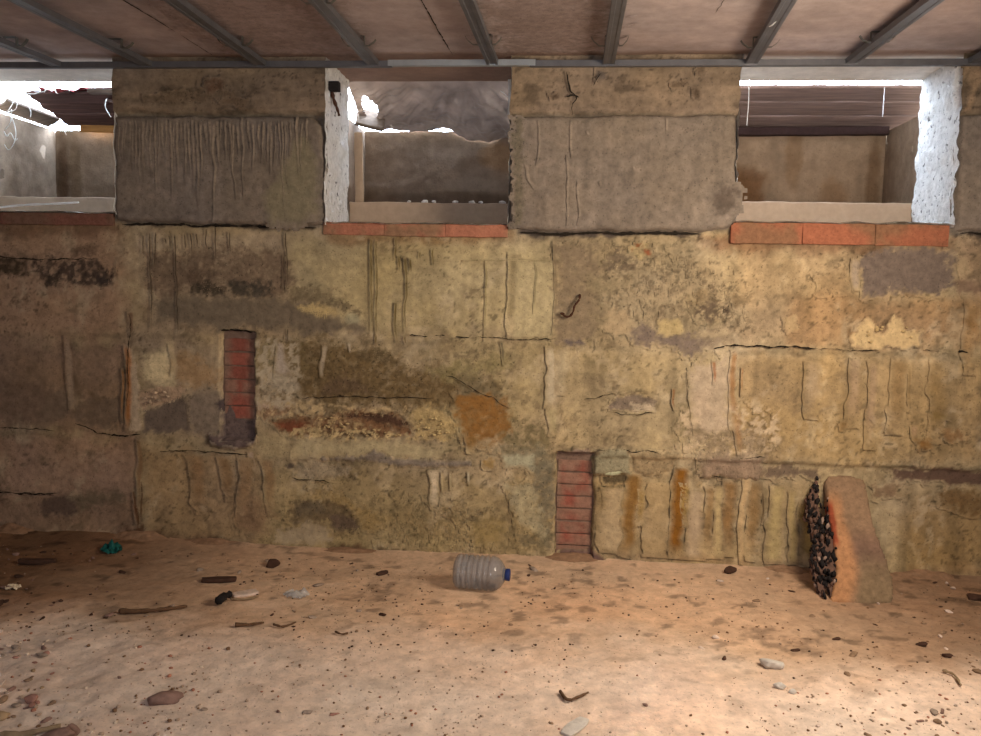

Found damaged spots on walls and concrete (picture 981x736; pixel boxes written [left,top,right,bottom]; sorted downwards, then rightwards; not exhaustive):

crack [421,0,453,55]
water stain [0,75,823,567]
crack [714,343,879,351]
crack [75,423,140,437]
crack [160,448,247,456]
crack [0,489,54,497]
rust [617,473,646,559]
rust [667,466,691,559]